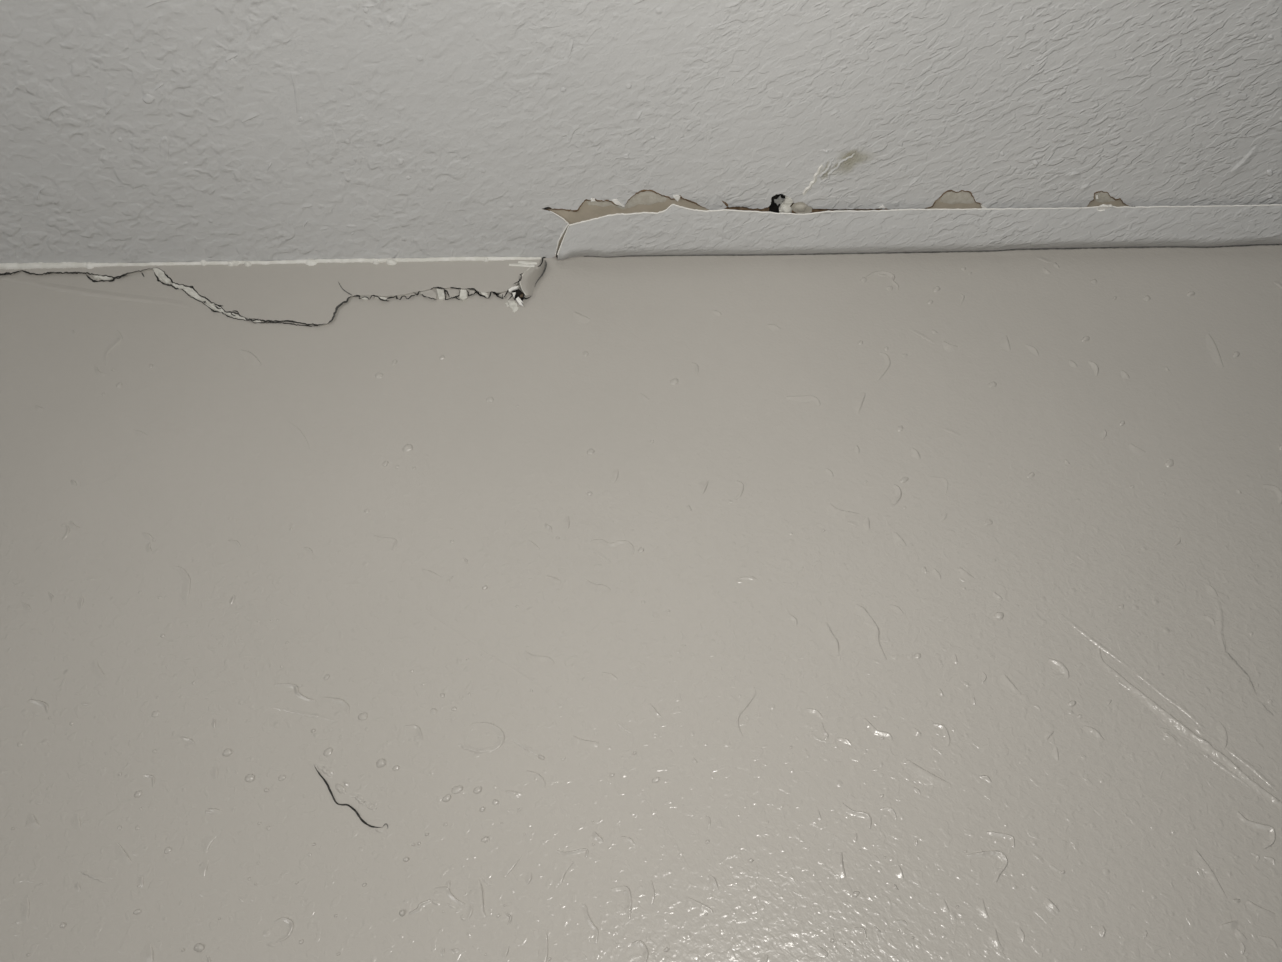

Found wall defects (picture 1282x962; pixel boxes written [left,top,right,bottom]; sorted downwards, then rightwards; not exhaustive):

crack [0,268,531,327]
peeling [0,190,1282,326]